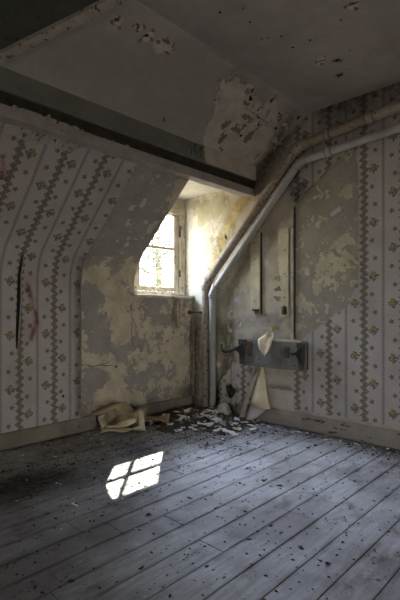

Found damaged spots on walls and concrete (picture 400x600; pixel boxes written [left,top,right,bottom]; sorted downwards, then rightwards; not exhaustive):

peeling [9,105,93,139]
flaking render [203,71,301,181]
peeling [82,174,254,417]
peeling [295,207,359,334]